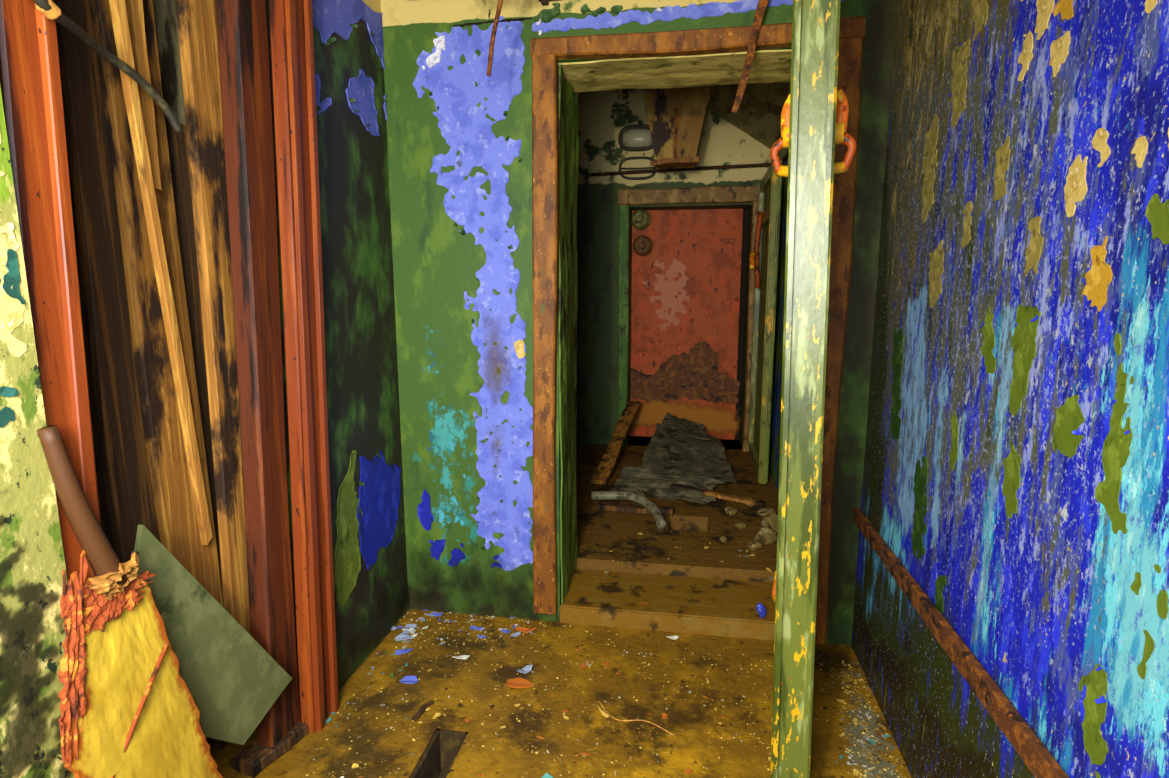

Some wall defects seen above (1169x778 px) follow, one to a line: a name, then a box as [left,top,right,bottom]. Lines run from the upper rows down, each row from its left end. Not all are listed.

peeling [1017,0,1074,81]
peeling [1064,128,1111,217]
peeling [1140,193,1169,245]
peeling [0,223,27,357]
peeling [413,0,793,571]
peeling [1082,236,1113,312]
peeling [1004,304,1041,417]
peeling [0,386,19,428]
peeling [1052,394,1085,458]
peeling [1095,333,1135,534]
peeling [1002,444,1022,518]
peeling [1078,664,1108,778]